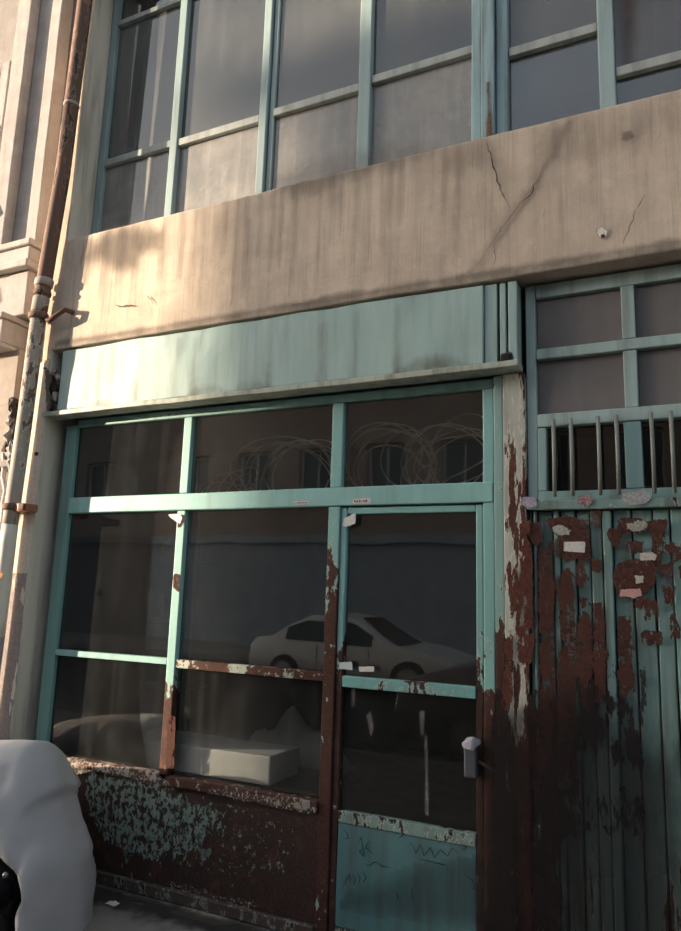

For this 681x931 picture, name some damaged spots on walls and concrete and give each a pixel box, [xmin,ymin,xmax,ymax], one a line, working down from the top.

damp [93,234,154,264]
crack [471,123,568,271]
crack [623,195,645,242]
peeling [0,359,61,740]